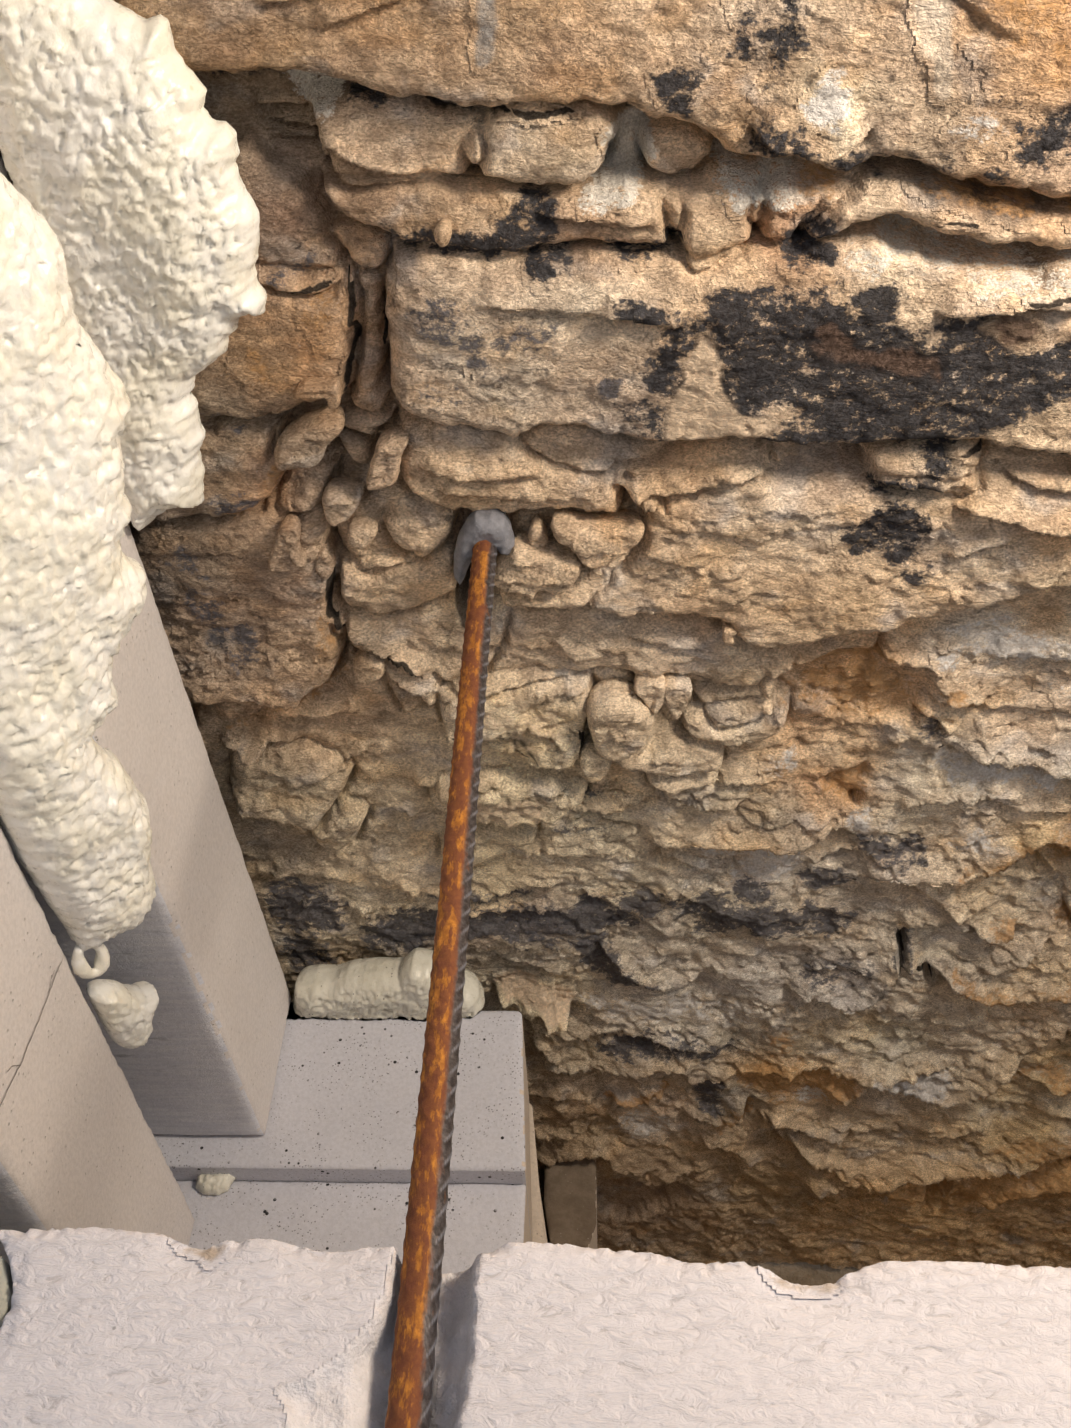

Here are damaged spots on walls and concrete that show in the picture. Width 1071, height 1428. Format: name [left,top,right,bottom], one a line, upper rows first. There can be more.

damp [644,0,1071,195]
damp [380,182,692,426]
damp [592,206,1071,594]
rust [214,578,354,740]